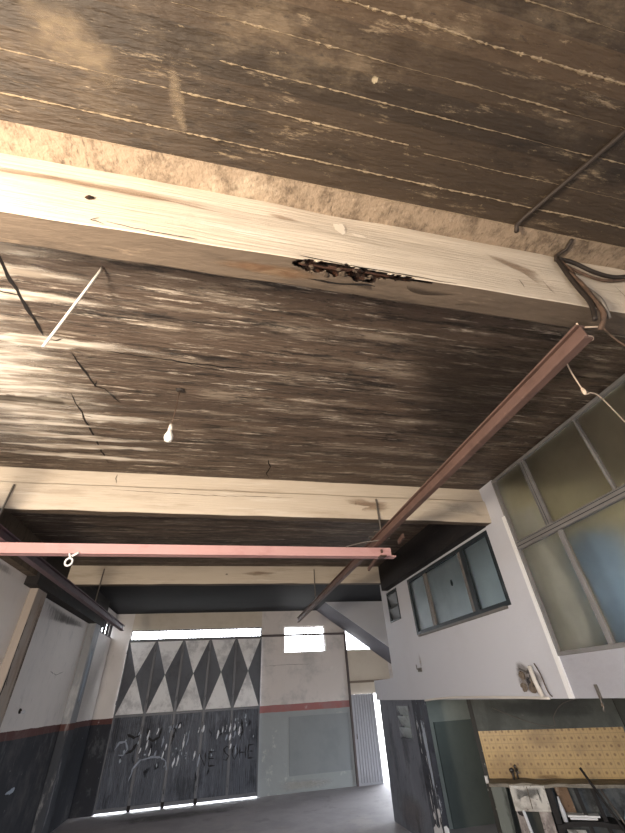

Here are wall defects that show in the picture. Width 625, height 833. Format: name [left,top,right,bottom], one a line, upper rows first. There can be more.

spalling [292,255,457,296]
crack [0,257,121,403]
crack [108,351,250,371]
crack [71,394,288,498]